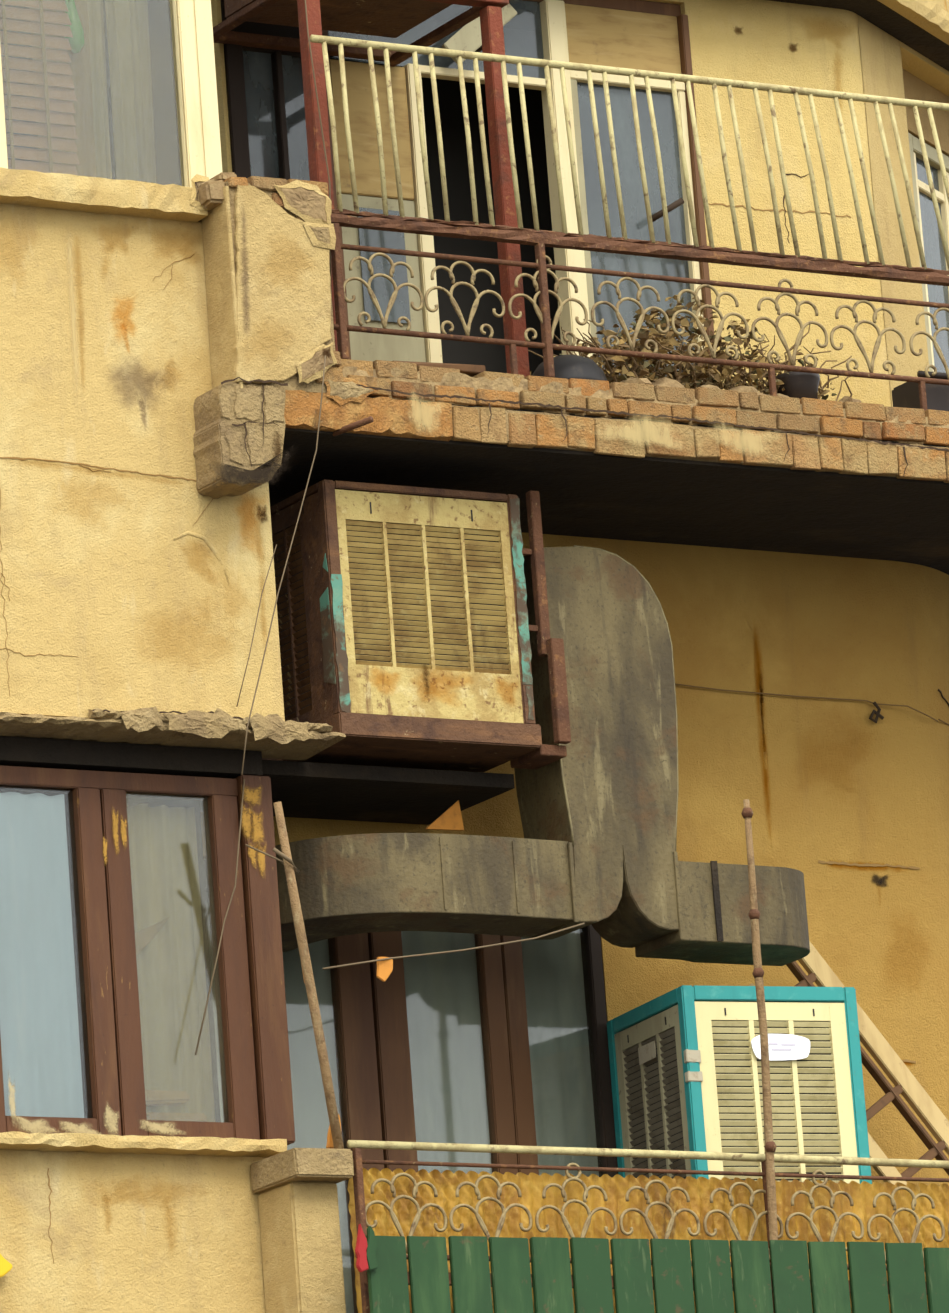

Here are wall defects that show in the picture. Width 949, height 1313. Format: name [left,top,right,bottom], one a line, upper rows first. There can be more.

spalling [190,172,336,250]
crack [708,173,851,243]
crack [0,457,214,526]
crack [0,490,76,694]
spalling [93,706,315,744]